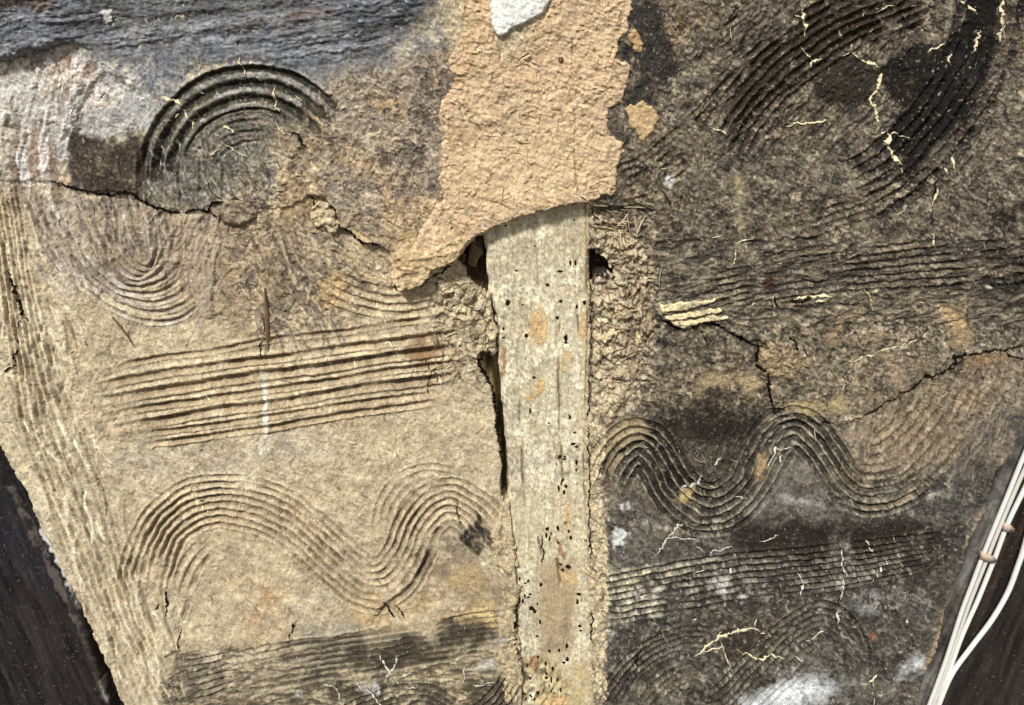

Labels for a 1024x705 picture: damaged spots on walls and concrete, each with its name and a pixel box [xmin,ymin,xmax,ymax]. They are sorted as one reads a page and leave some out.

crack [43,180,256,226]
crack [309,195,388,251]
crack [473,299,506,502]
crack [659,314,807,410]
crack [840,333,926,394]
crack [839,345,1024,425]
spalling [457,495,523,704]